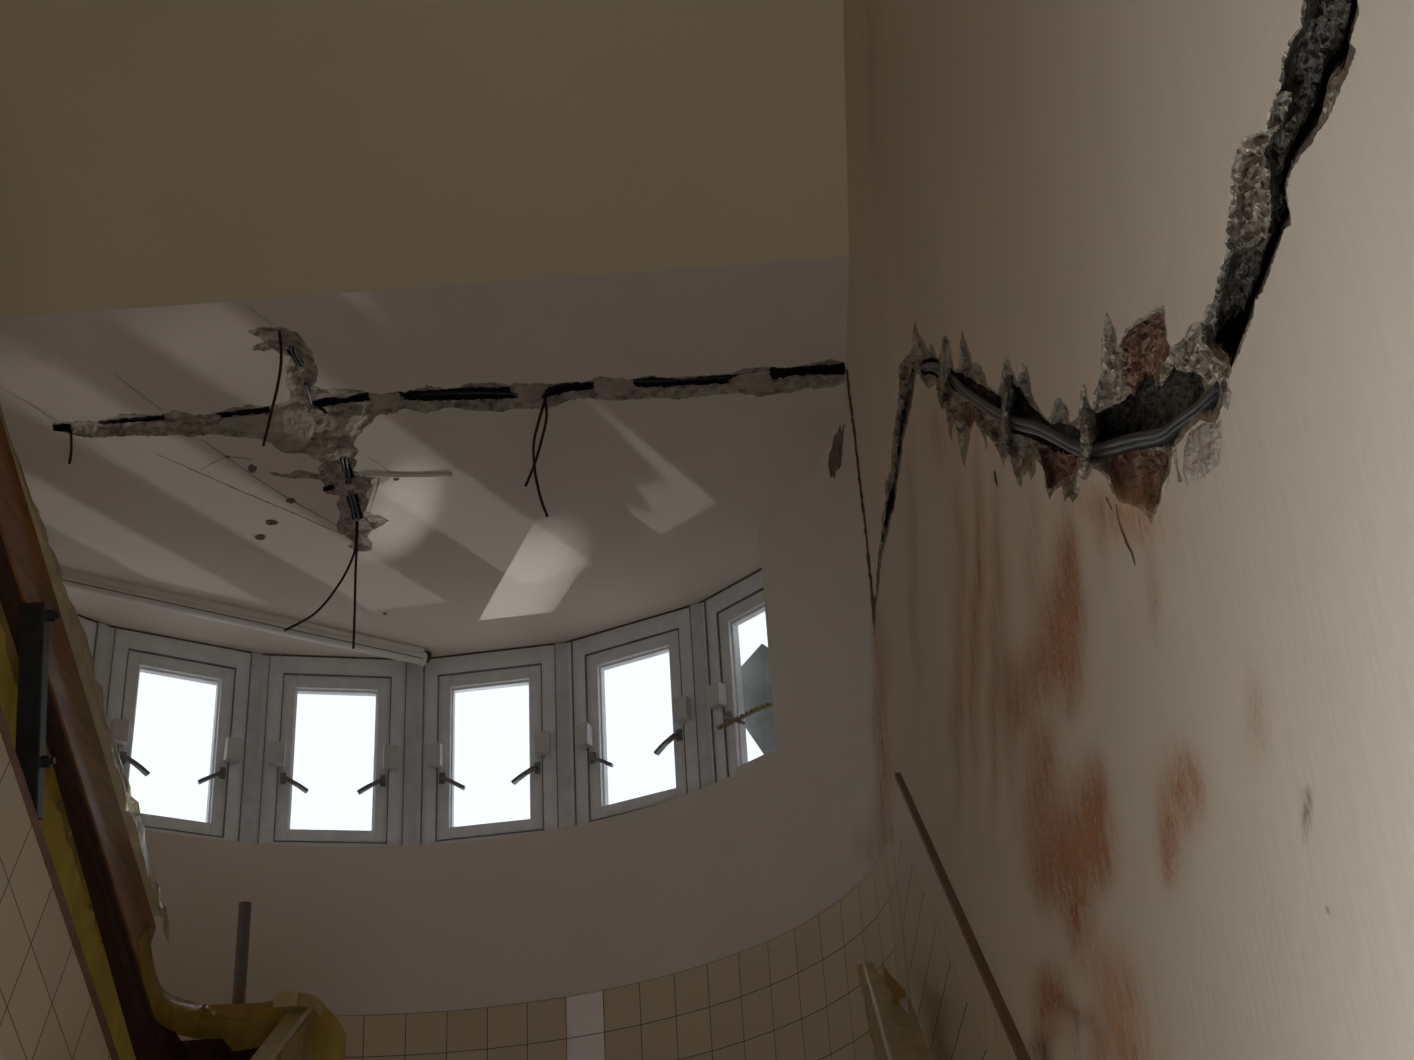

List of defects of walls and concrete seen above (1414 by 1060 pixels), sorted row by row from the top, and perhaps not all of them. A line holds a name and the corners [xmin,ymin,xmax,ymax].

flaking render [1317,48,1354,125]
flaking render [1230,91,1295,242]
flaking render [828,424,845,479]
peeling [1173,387,1231,487]